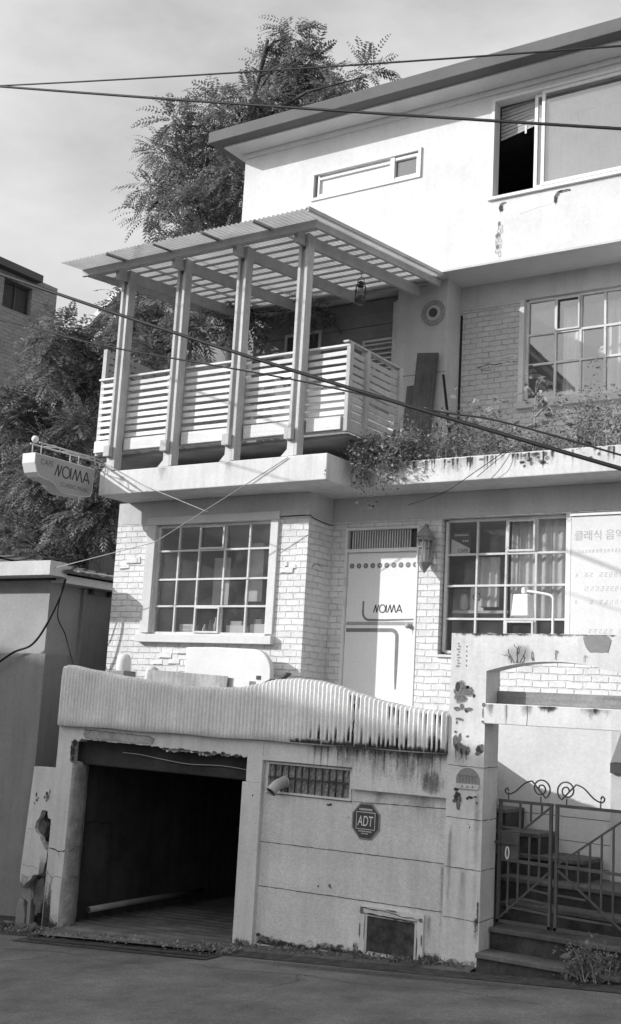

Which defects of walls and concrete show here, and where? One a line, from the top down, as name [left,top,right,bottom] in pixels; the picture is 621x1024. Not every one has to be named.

peeling [495,202,507,257]
leakage [407,455,496,469]
peeling [452,680,486,756]
spalling [70,739,78,764]
leakage [290,706,467,793]
peeling [452,787,478,810]
crack [21,828,83,893]